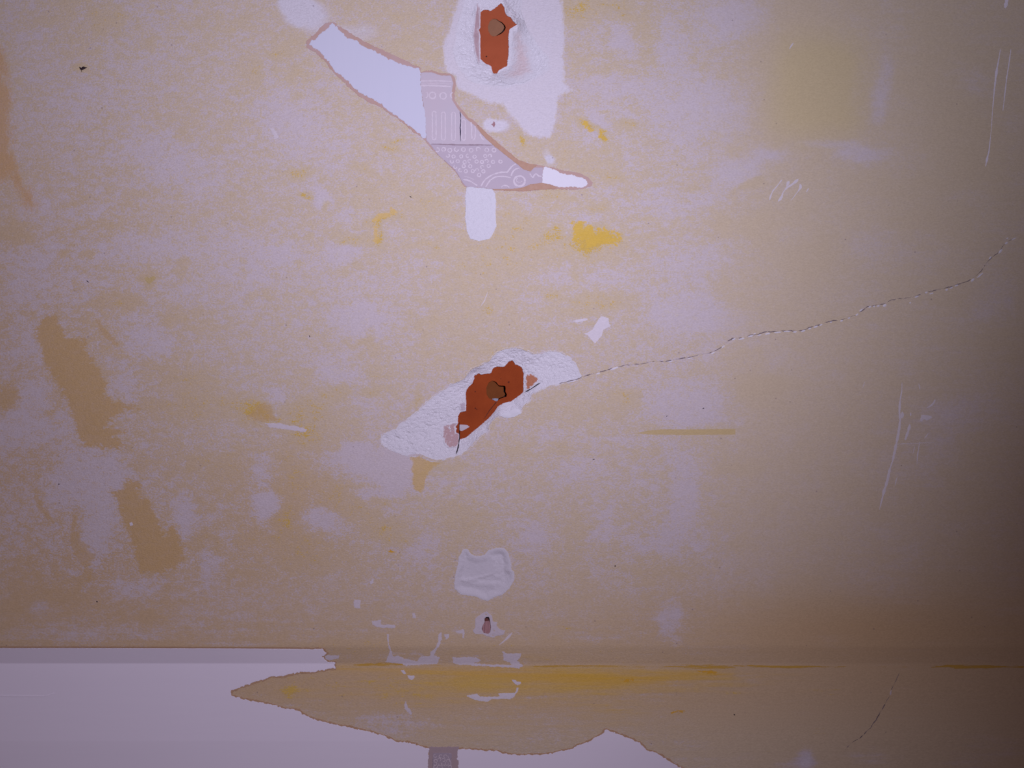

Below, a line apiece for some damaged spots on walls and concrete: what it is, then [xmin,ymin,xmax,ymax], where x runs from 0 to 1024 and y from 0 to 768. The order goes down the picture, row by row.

flaking render [306,0,593,192]
damp [562,212,627,254]
damp [31,310,145,454]
flaking render [380,347,582,462]
peeling [574,316,611,343]
crack [559,238,1016,384]
damp [108,472,190,578]
flaking render [372,548,523,702]
peeling [0,646,684,768]